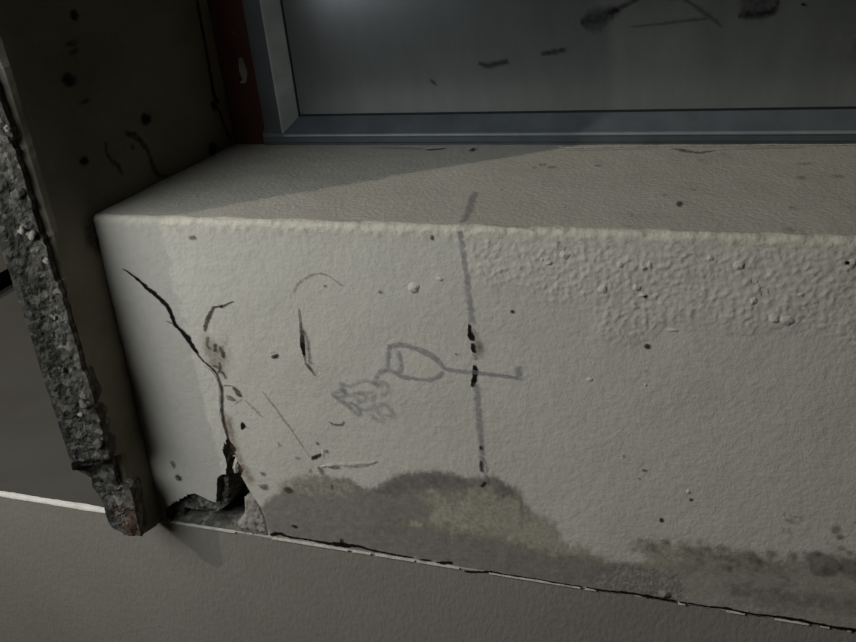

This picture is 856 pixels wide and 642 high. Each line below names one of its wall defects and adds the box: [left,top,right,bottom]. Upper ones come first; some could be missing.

spalling [0,85,149,536]
crack [123,269,233,440]
spalling [165,440,268,535]
water stain [262,472,856,628]
crack [270,532,856,632]